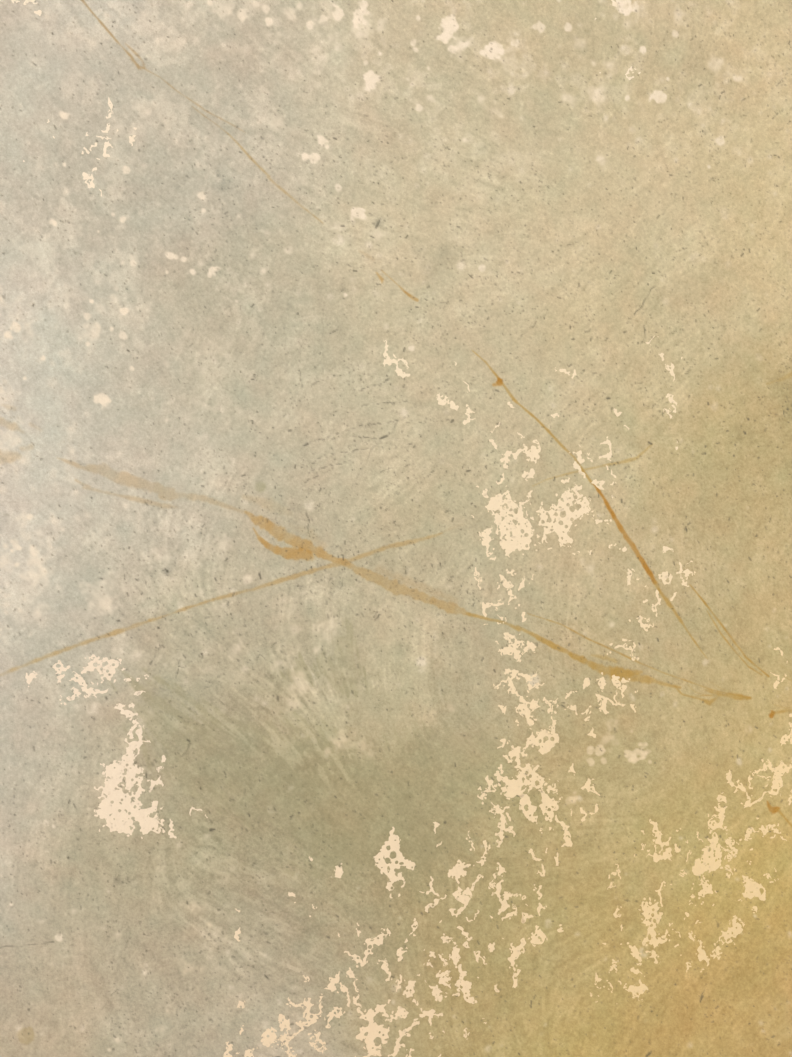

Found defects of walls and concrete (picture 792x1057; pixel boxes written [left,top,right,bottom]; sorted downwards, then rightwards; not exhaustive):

peeling [436,381,476,425]
peeling [52,654,177,839]
peeling [223,422,639,1057]
peeling [780,713,792,746]
peeling [590,758,792,1004]